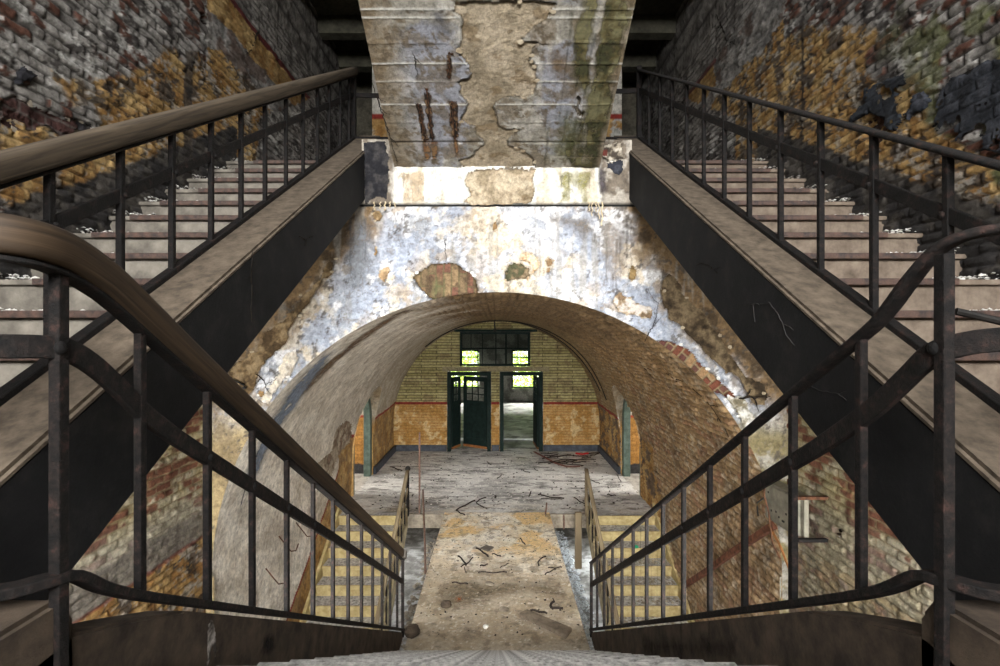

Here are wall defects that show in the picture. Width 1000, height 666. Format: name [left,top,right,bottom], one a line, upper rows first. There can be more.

rust [446,52,454,79]
spalling [0,95,92,136]
rust [416,88,438,160]
rust [448,101,459,156]
peeling [454,0,556,206]
leakage [551,169,623,278]
leakage [348,224,368,285]
flaking render [413,263,478,299]
flaking render [504,252,555,282]
flaking render [657,274,767,428]
crack [748,302,795,346]